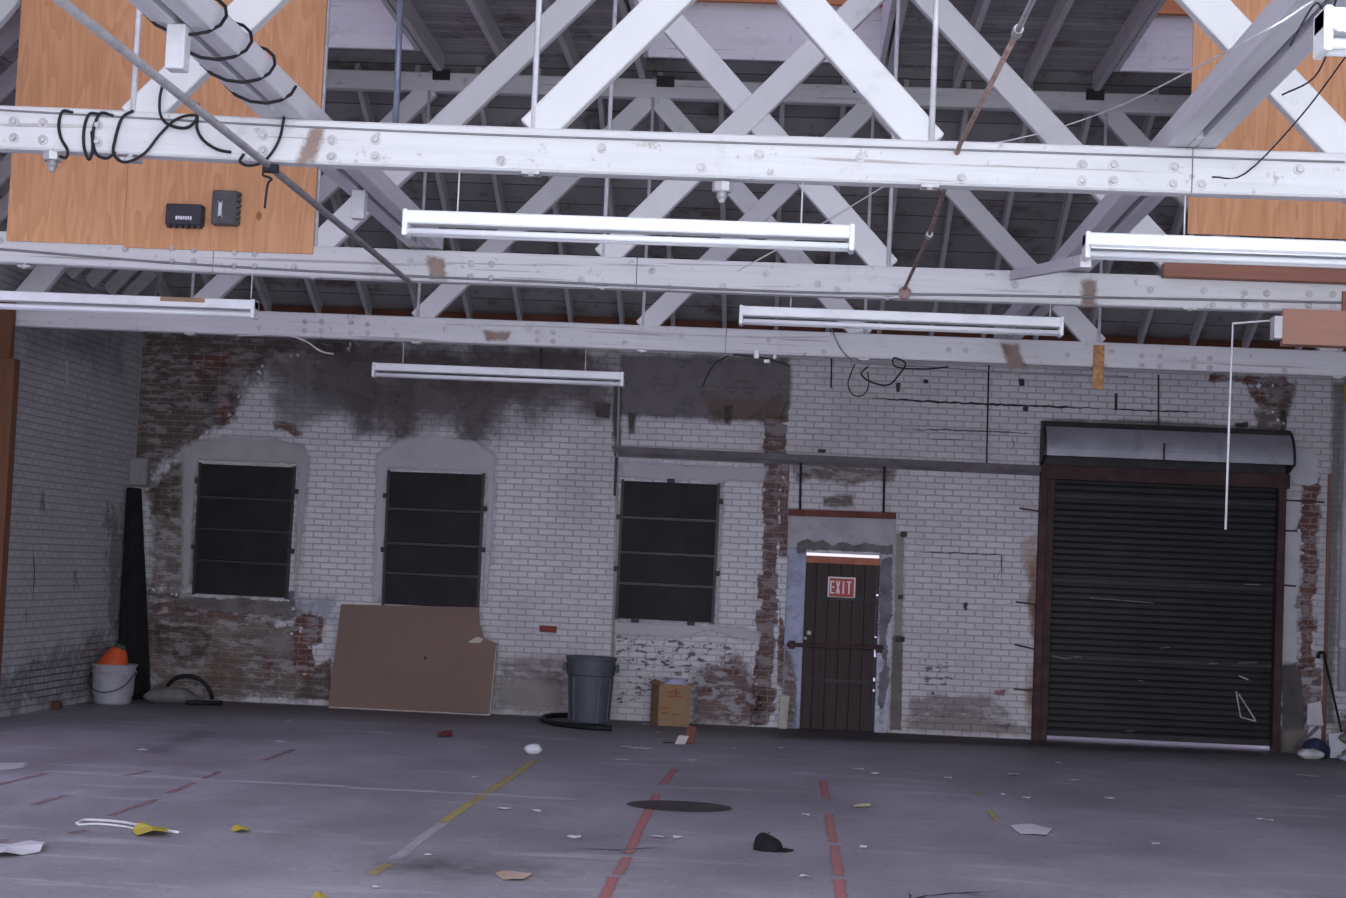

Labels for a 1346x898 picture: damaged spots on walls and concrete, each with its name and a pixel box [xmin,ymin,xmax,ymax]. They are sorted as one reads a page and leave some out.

peeling [136,332,354,700]
water stain [484,331,509,340]
water stain [595,355,791,446]
flaking render [616,401,907,730]
peeling [1209,373,1295,430]
flaking render [1295,478,1322,721]